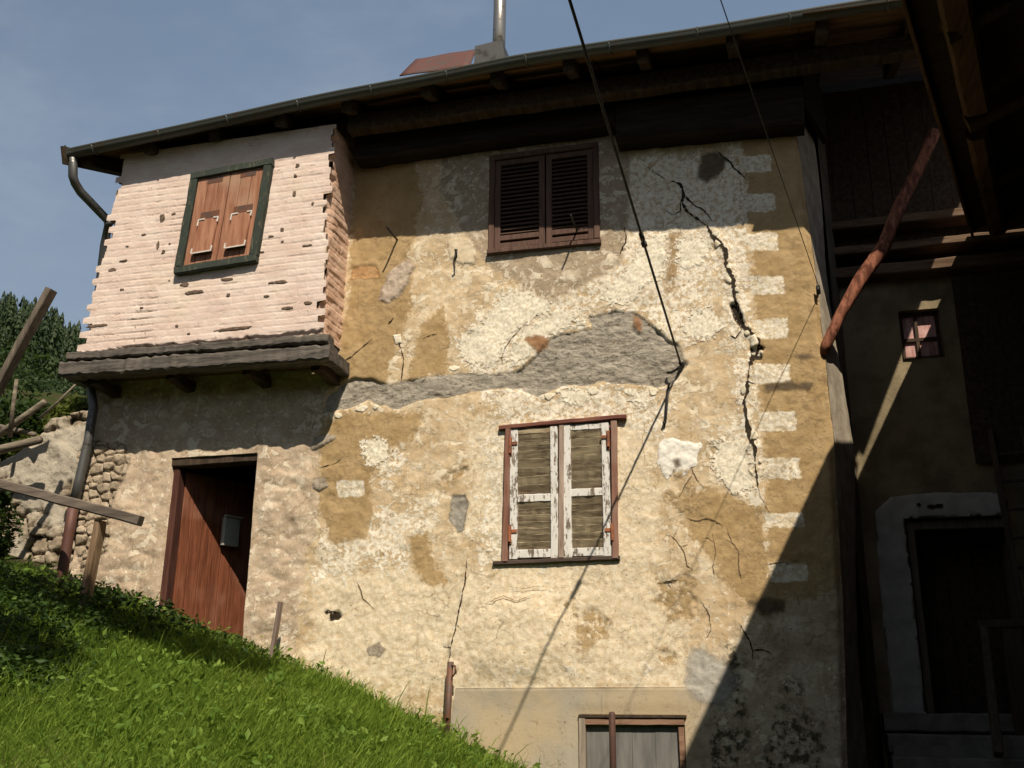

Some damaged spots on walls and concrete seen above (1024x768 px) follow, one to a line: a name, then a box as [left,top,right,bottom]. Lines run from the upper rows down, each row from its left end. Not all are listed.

crack [719,152,748,180]
spalling [323,232,727,418]
crack [640,162,768,510]
crack [658,470,741,588]
crack [443,556,468,658]
crack [741,626,772,660]